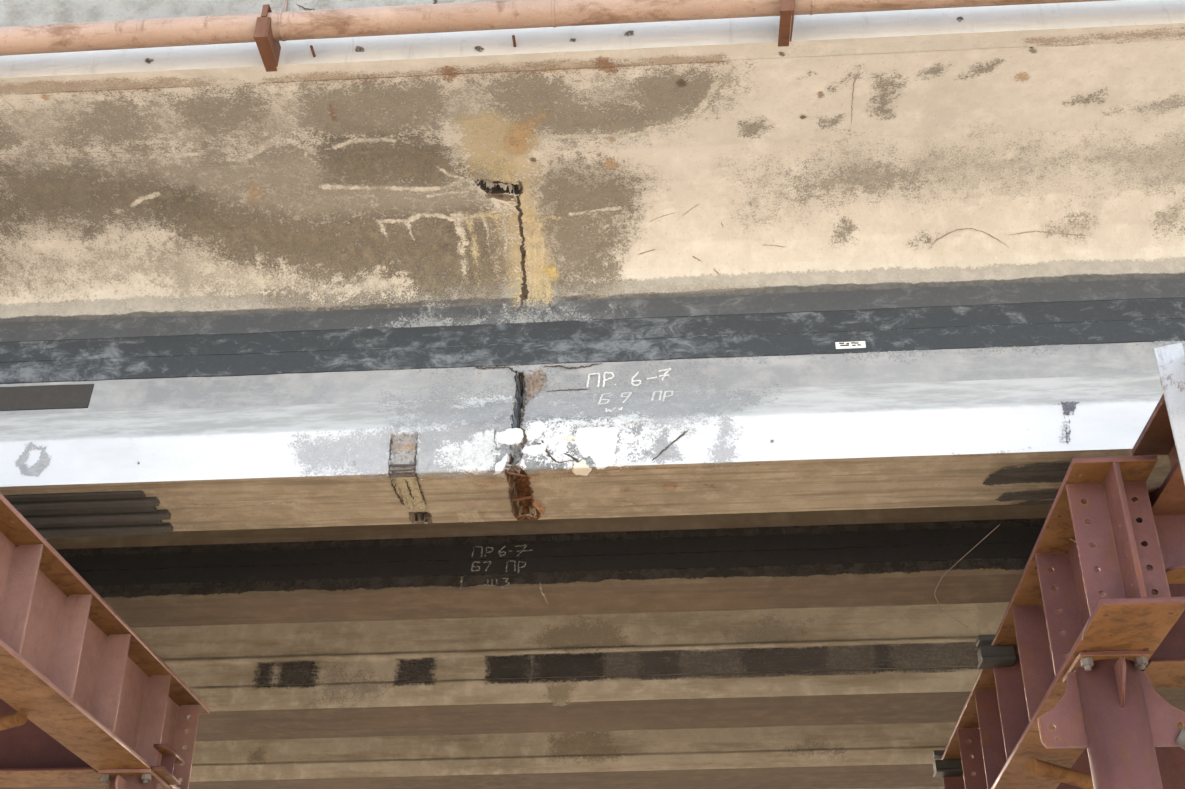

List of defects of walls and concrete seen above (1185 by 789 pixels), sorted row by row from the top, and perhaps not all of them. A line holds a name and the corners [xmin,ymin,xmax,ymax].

water stain [0,60,751,329]
spalling [475,179,523,202]
crack [515,180,529,308]
corrosion [501,179,560,308]
water stain [738,115,773,139]